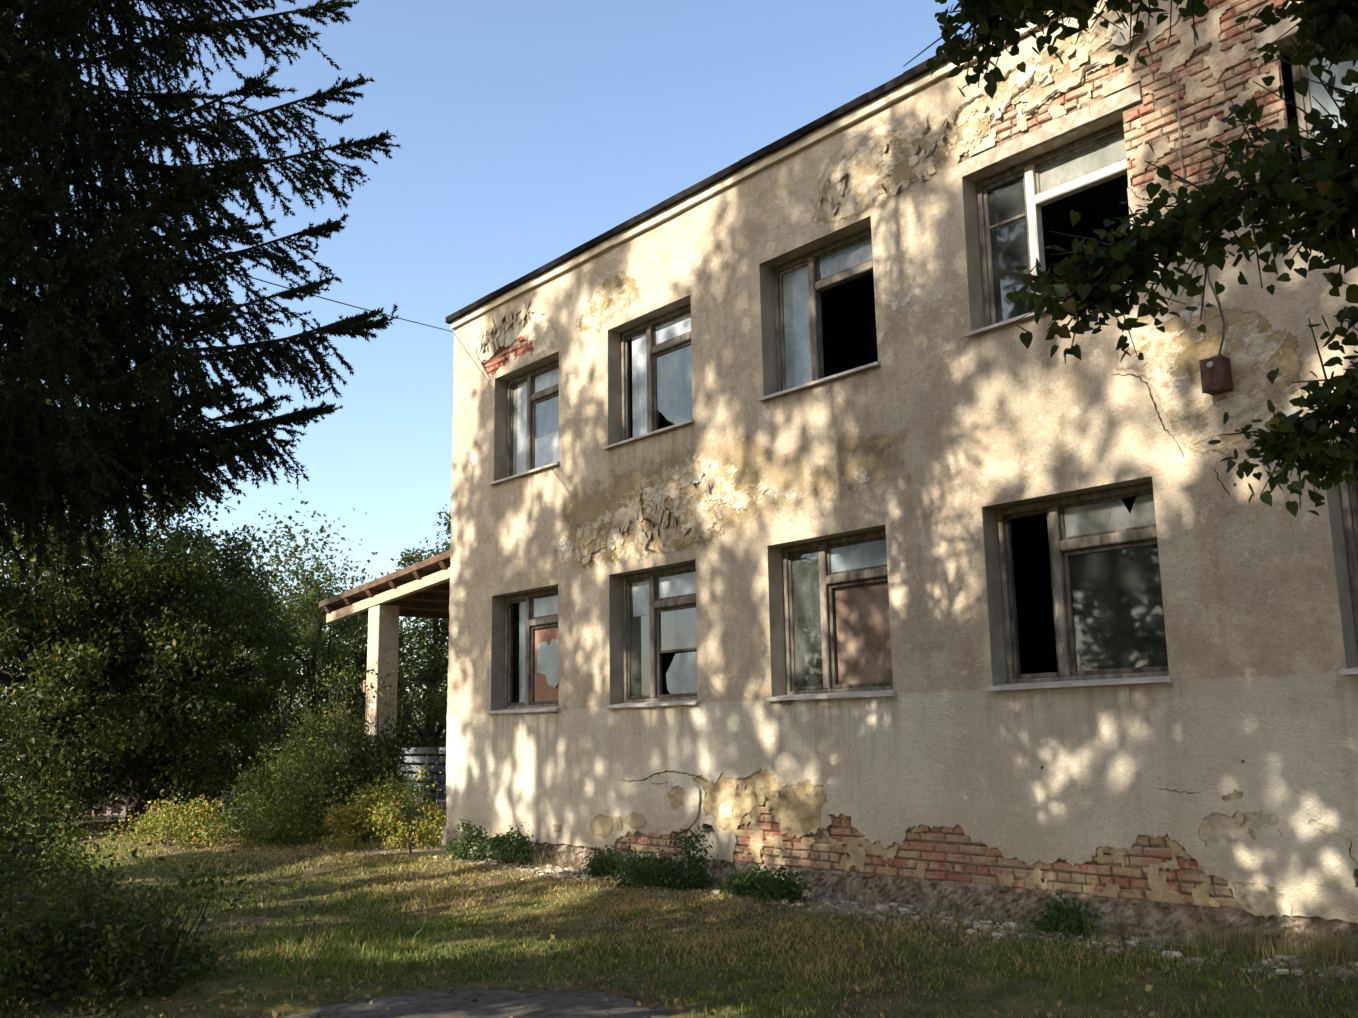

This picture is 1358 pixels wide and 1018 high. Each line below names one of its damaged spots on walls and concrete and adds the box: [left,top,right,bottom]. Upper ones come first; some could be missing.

flaking render [813,0,1303,225]
flaking render [477,301,556,377]
flaking render [1111,297,1306,459]
flaking render [562,451,773,569]
flaking render [589,769,1292,918]